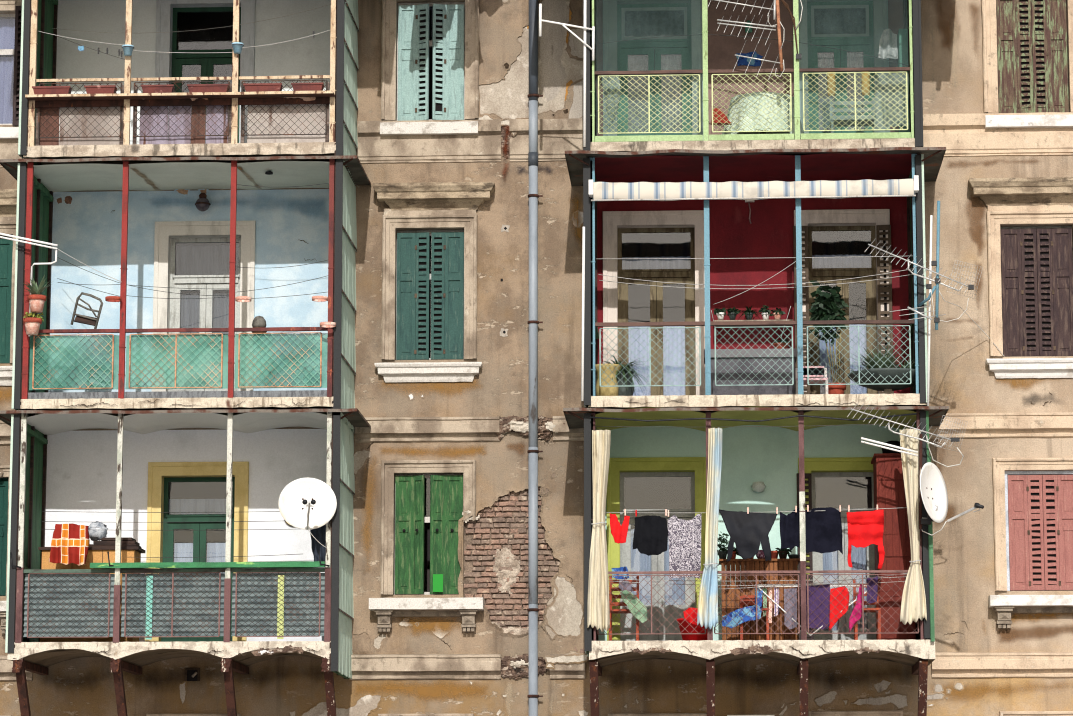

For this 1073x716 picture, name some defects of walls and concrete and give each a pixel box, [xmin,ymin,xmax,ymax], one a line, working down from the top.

flaking render [477,0,583,159]
spalling [454,470,584,641]
spalling [251,645,304,656]
spalling [501,653,588,680]
flaking render [288,693,383,716]